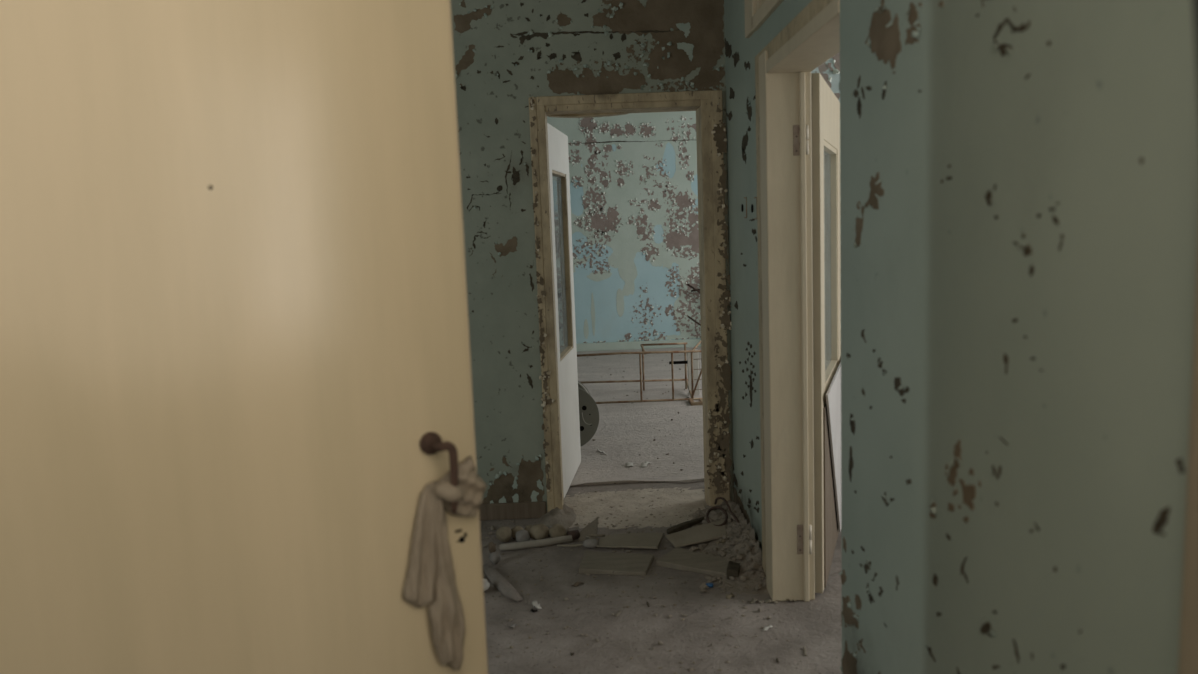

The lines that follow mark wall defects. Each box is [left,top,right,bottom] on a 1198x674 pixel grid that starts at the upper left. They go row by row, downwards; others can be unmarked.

peeling [821,0,922,119]
peeling [853,172,884,248]
peeling [454,0,761,545]
peeling [928,440,1002,523]
peeling [839,569,866,674]